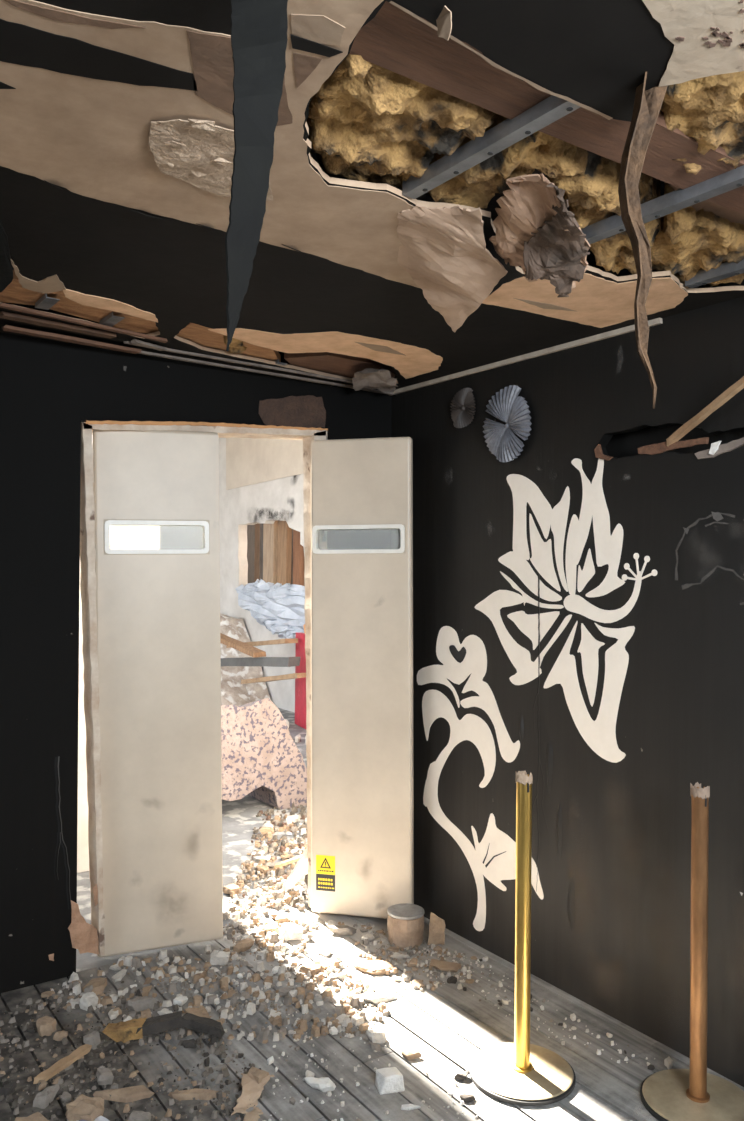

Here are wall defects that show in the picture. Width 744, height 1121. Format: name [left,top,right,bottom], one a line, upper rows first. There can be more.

peeling [642,0,744,87]
peeling [0,0,235,232]
peeling [259,0,420,288]
peeling [11,259,158,323]
spalling [594,444,613,460]
spalling [637,437,744,459]